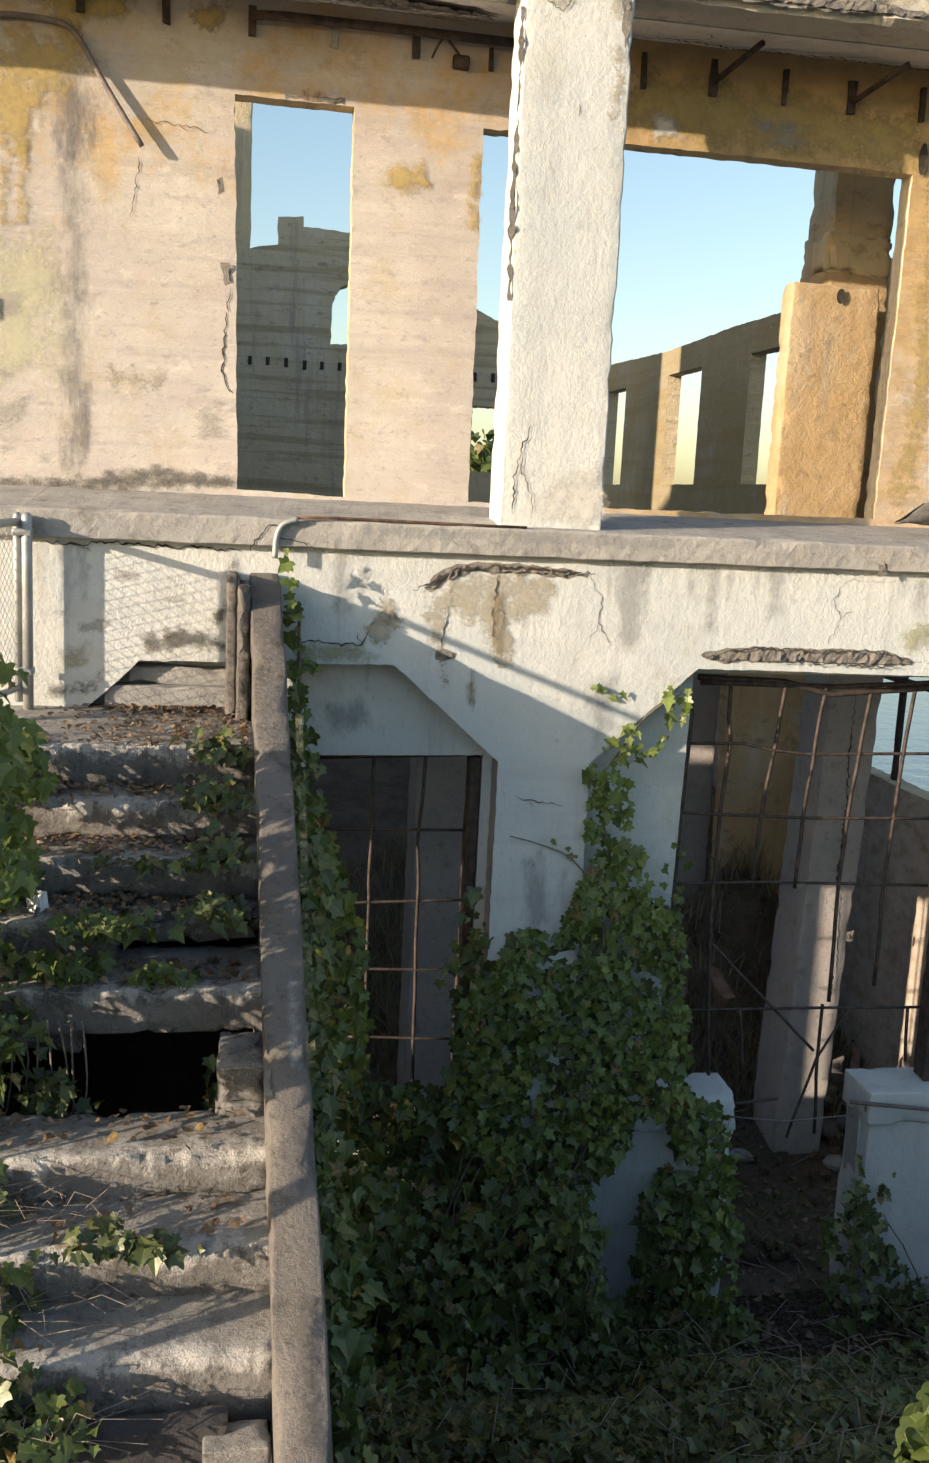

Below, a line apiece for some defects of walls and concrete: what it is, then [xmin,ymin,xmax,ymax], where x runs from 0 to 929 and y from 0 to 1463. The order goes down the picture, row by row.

crack [221,287,233,393]
crack [512,426,533,518]
peeling [415,561,593,683]
spalling [701,646,927,668]